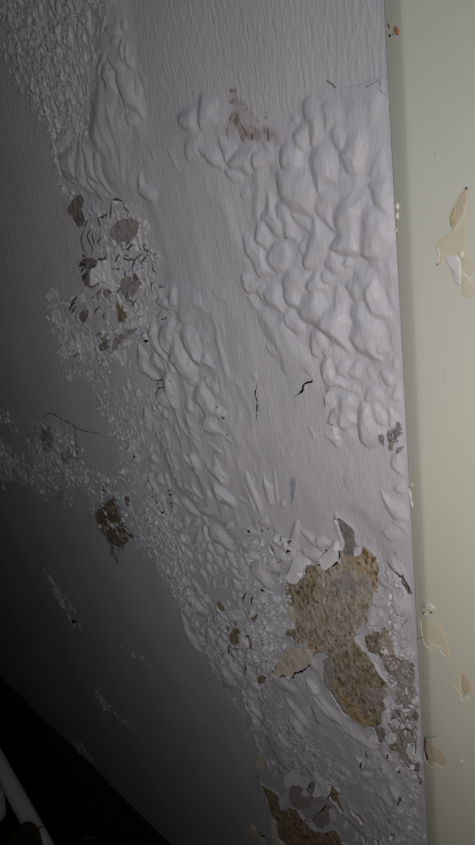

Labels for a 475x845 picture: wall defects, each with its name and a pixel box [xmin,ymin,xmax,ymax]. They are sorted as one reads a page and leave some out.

peeling [0,0,169,376]
peeling [434,187,475,298]
peeling [0,402,248,717]
spalling [214,518,445,791]
spalling [257,769,364,845]